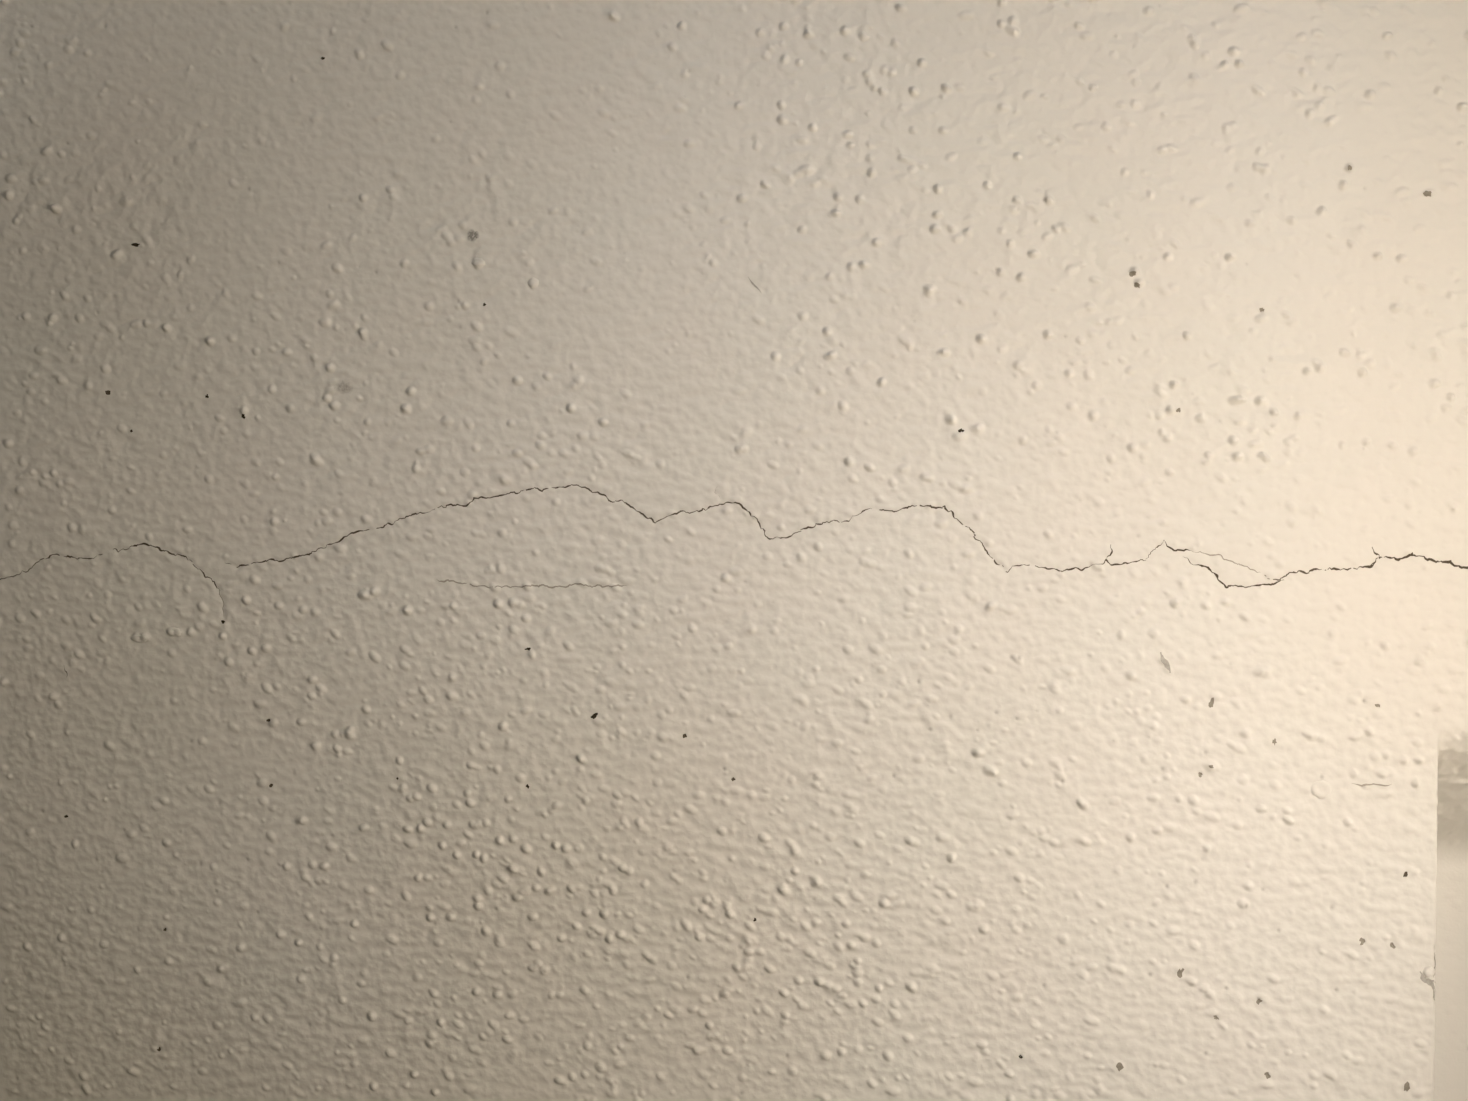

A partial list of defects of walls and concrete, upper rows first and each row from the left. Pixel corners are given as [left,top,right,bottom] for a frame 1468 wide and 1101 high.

crack [0,484,1468,616]